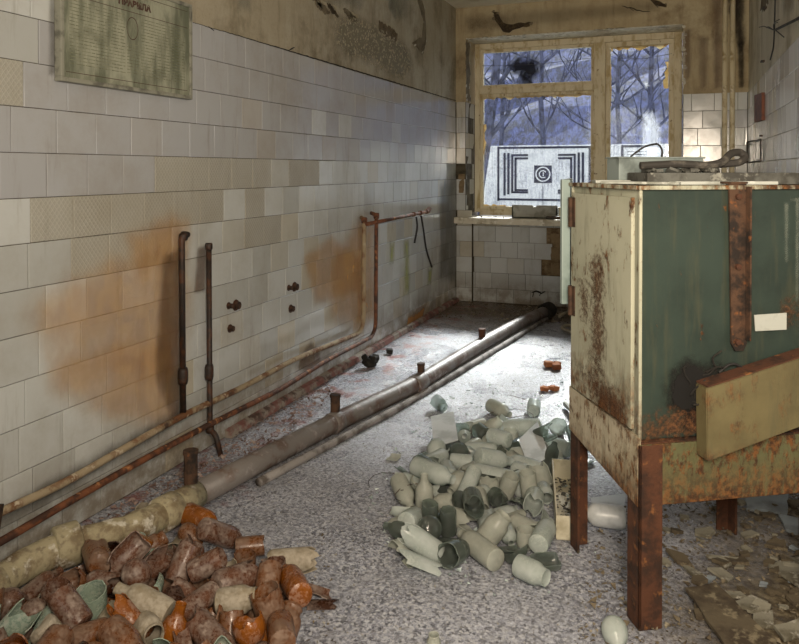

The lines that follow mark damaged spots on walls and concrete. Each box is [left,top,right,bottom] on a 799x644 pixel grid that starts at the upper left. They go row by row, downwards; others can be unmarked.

flaking render [315,0,358,23]
peeling [412,0,427,54]
peeling [492,10,533,33]
water stain [729,0,744,87]
peeling [535,227,560,276]